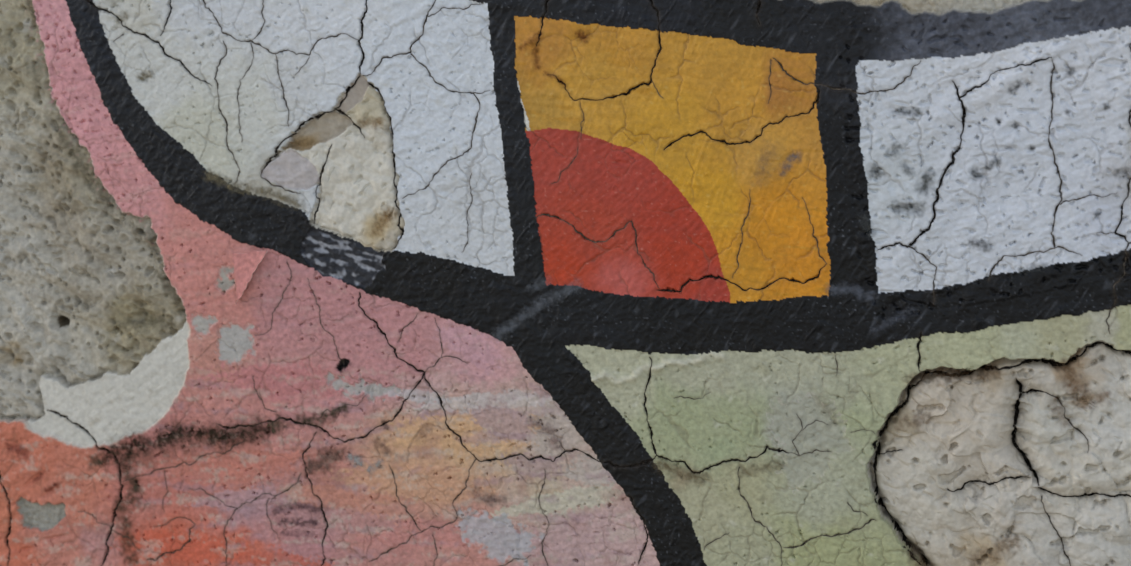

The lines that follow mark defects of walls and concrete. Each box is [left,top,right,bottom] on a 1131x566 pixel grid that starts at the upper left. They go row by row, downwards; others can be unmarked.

crack [86,0,485,253]
flaking render [261,74,405,289]
crack [551,0,663,184]
crack [664,58,921,150]
flaking render [815,0,1030,15]
crack [878,57,1110,304]
peeling [214,251,267,304]
crack [0,475,12,565]
flaking render [17,497,66,532]
peeling [25,312,257,449]
crack [47,178,1131,566]
flaking render [868,341,1131,566]